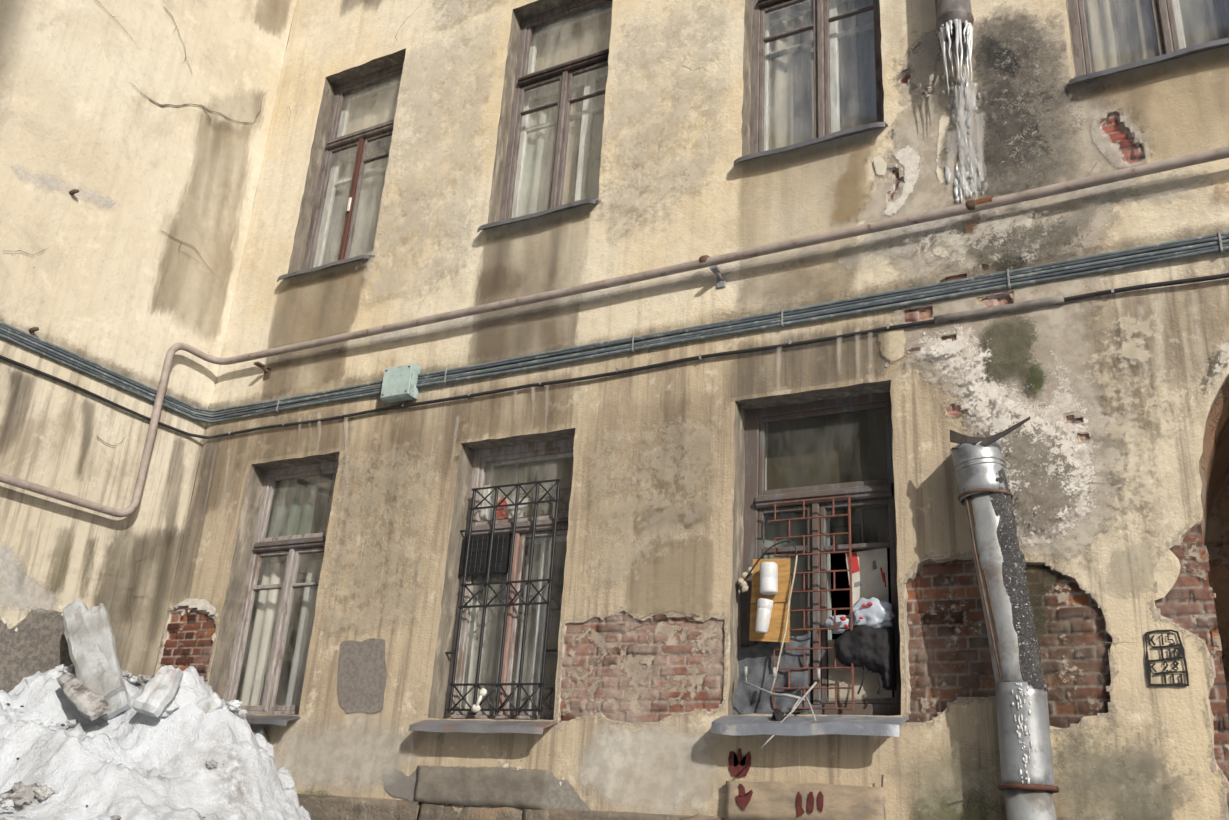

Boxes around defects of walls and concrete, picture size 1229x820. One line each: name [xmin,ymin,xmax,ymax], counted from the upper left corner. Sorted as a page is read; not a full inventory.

crack [134,7,291,123]
water stain [936,9,1068,204]
peeling [856,4,1229,820]
water stain [54,551,68,590]
water stain [95,547,126,614]
peeling [0,608,73,693]
spalling [154,598,219,684]
spalling [553,607,729,730]